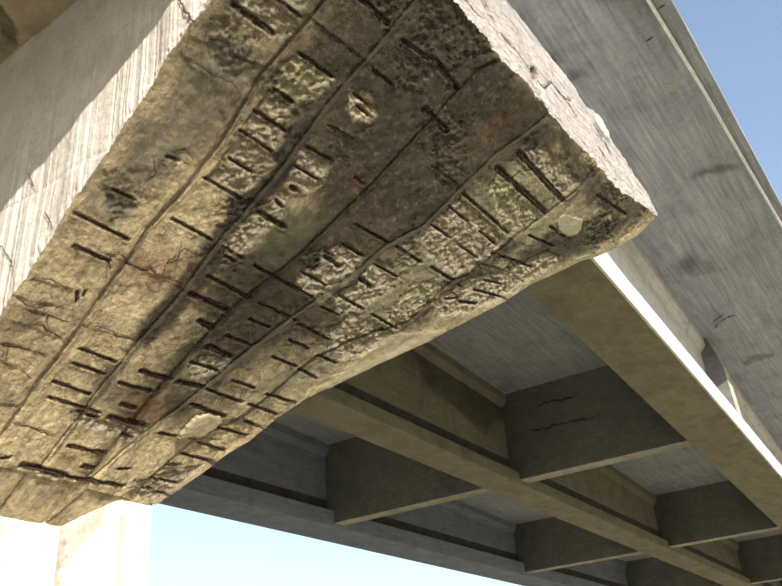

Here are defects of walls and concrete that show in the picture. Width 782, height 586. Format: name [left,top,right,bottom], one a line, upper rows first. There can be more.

crack [178,0,259,65]
crack [187,61,241,115]
spalling [348,90,377,121]
water stain [111,0,646,425]
crack [107,248,200,289]
crack [18,298,69,340]
crack [88,326,134,341]
crack [0,344,43,379]
crack [0,402,48,435]
peeling [158,403,246,452]
spalling [20,453,217,500]